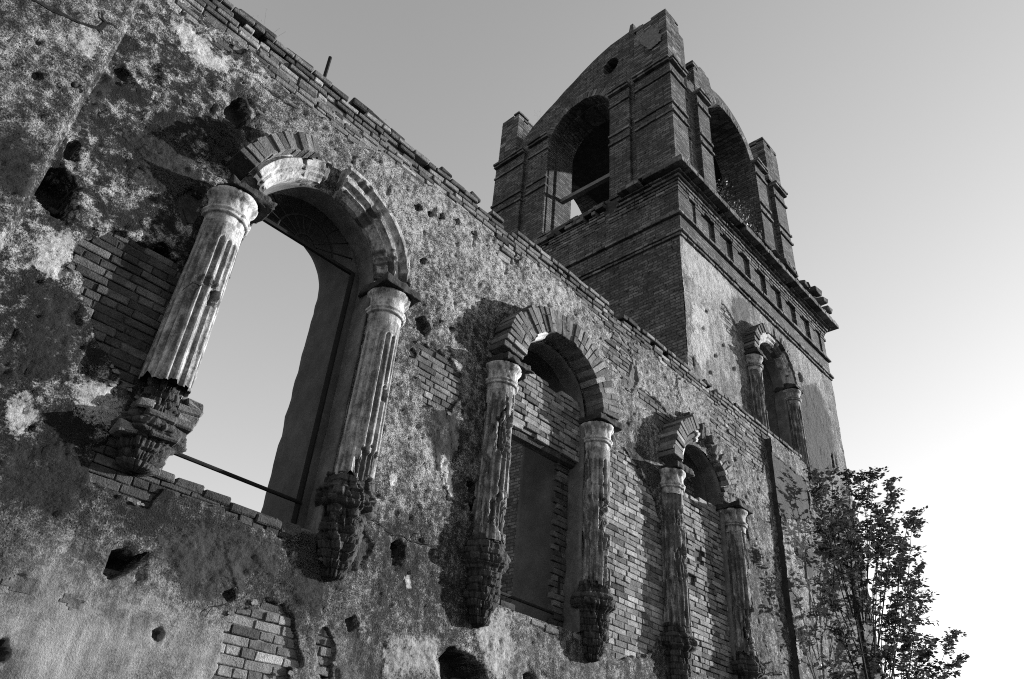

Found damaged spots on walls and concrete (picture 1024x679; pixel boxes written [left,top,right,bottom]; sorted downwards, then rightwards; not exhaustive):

hole [224,98,247,129]
hole [34,171,73,221]
peeling [66,227,317,539]
peeling [408,318,461,416]
hole [103,551,134,579]
peeling [211,592,299,679]
peeling [315,628,338,678]